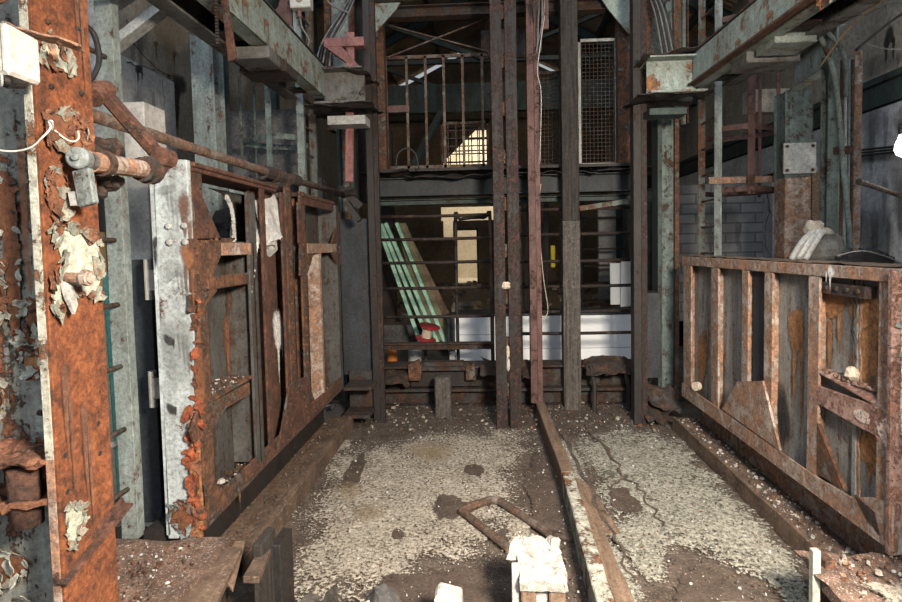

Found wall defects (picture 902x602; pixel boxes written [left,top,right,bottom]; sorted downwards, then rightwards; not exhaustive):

peeling [39,29,78,78]
peeling [0,154,40,381]
peeling [41,105,107,325]
rust [179,193,194,303]
peeling [0,368,9,421]
peeling [165,299,207,540]
rust [697,329,708,397]
rust [788,306,805,431]
rust [825,294,879,387]
rust [853,409,895,486]